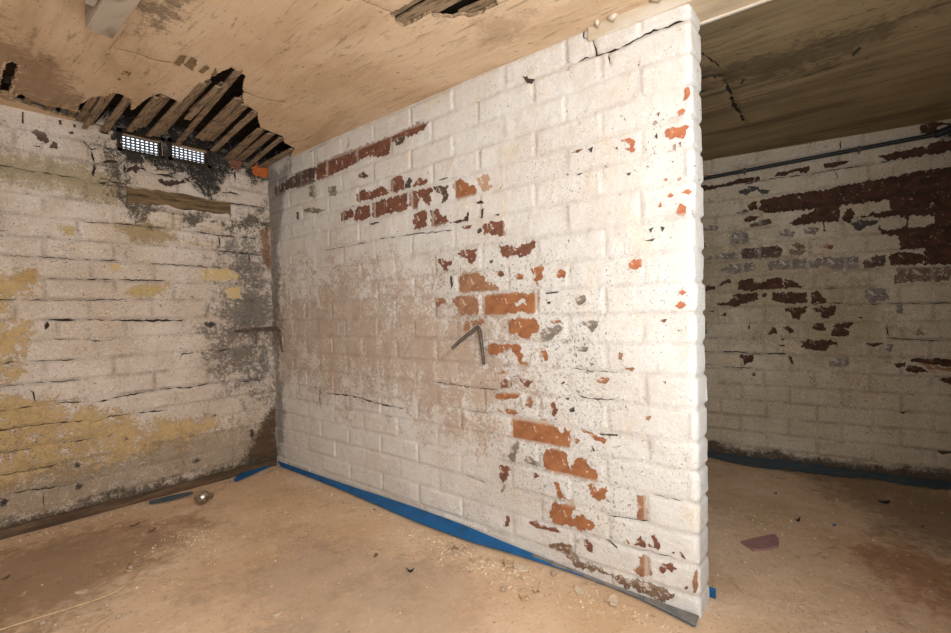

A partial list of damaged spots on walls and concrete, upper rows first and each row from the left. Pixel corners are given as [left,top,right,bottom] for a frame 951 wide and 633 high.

spalling [389,0,498,27]
crack [579,20,685,62]
flaking render [0,55,295,179]
peeling [652,75,726,152]
crack [700,52,745,121]
flaking render [878,122,951,161]
damp [119,223,176,245]
flaking render [147,210,223,249]
flaking render [658,166,951,368]
damp [0,267,277,530]
peeling [275,121,698,606]
peeling [895,358,951,385]